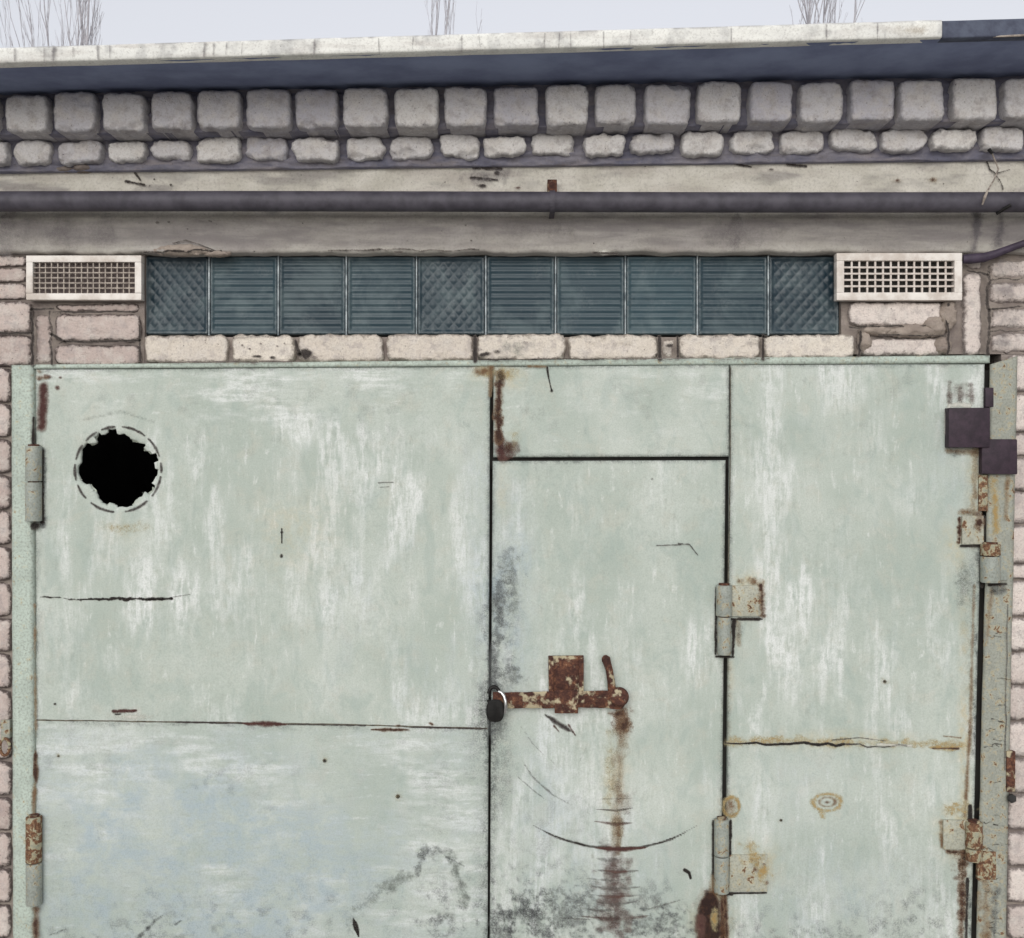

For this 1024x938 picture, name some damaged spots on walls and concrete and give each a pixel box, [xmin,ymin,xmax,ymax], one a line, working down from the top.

corrosion [36,370,61,431]
corrosion [475,365,494,396]
corrosion [957,477,1010,547]
crack [725,608,1011,782]
corrosion [939,585,975,938]
corrosion [598,708,632,938]
corrosion [695,841,773,938]
crack [978,878,1002,938]